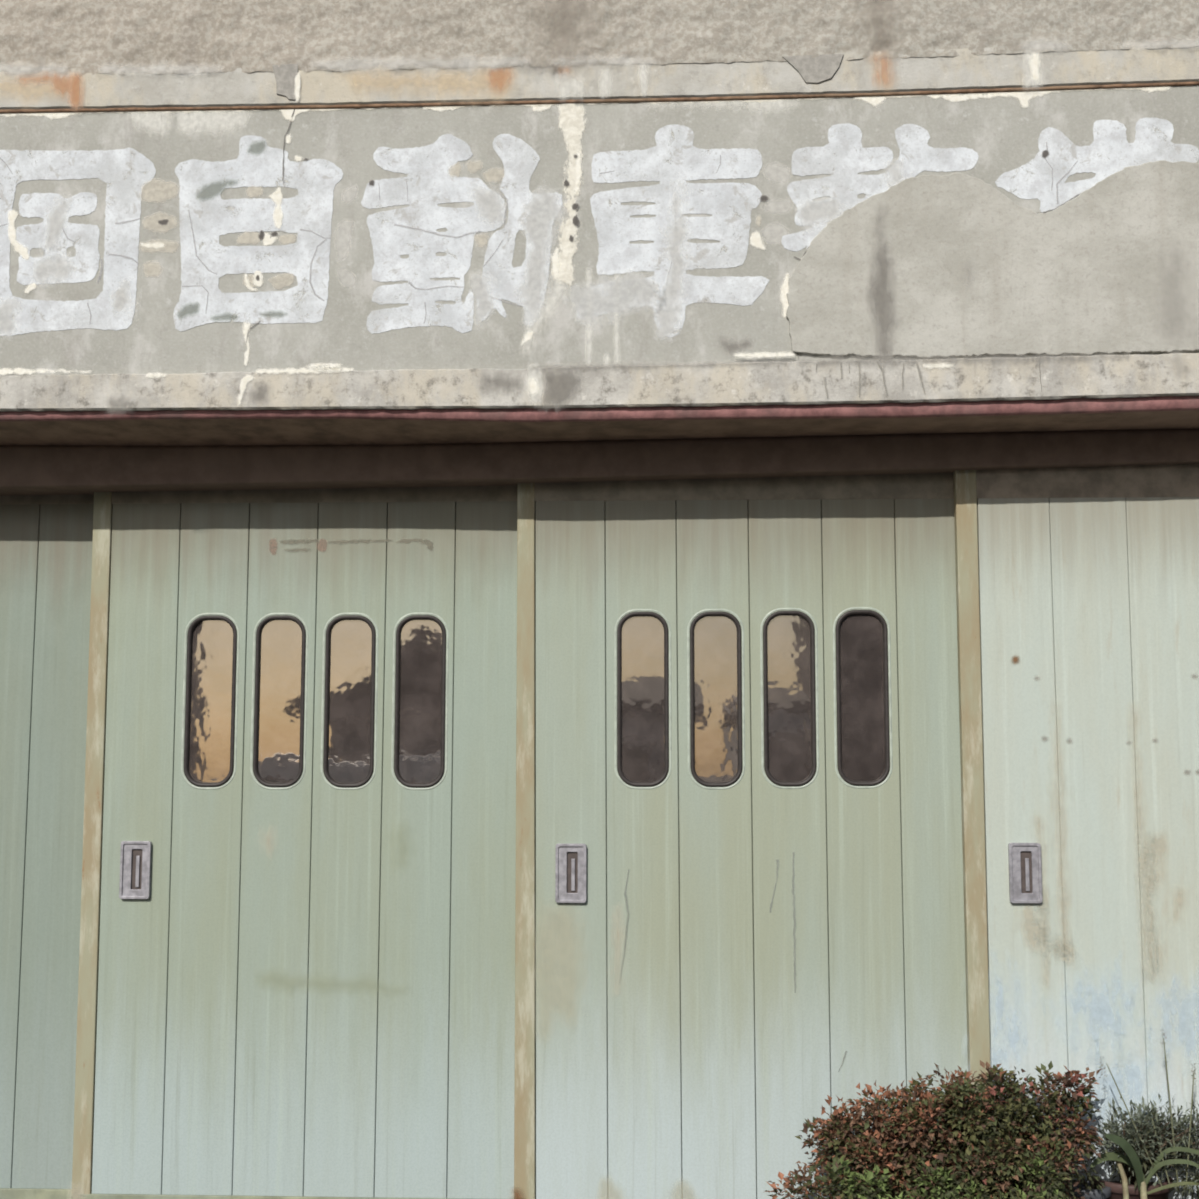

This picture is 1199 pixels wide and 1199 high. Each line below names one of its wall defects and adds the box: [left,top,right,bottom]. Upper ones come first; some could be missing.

rust [21,75,79,106]
water stain [118,109,279,132]
spalling [782,54,844,83]
water stain [613,41,1169,109]
crack [182,214,216,310]
crack [245,109,328,301]
water stain [515,0,621,345]
water stain [750,216,765,249]
water stain [697,244,972,398]
crack [238,321,261,404]
water stain [252,364,353,401]